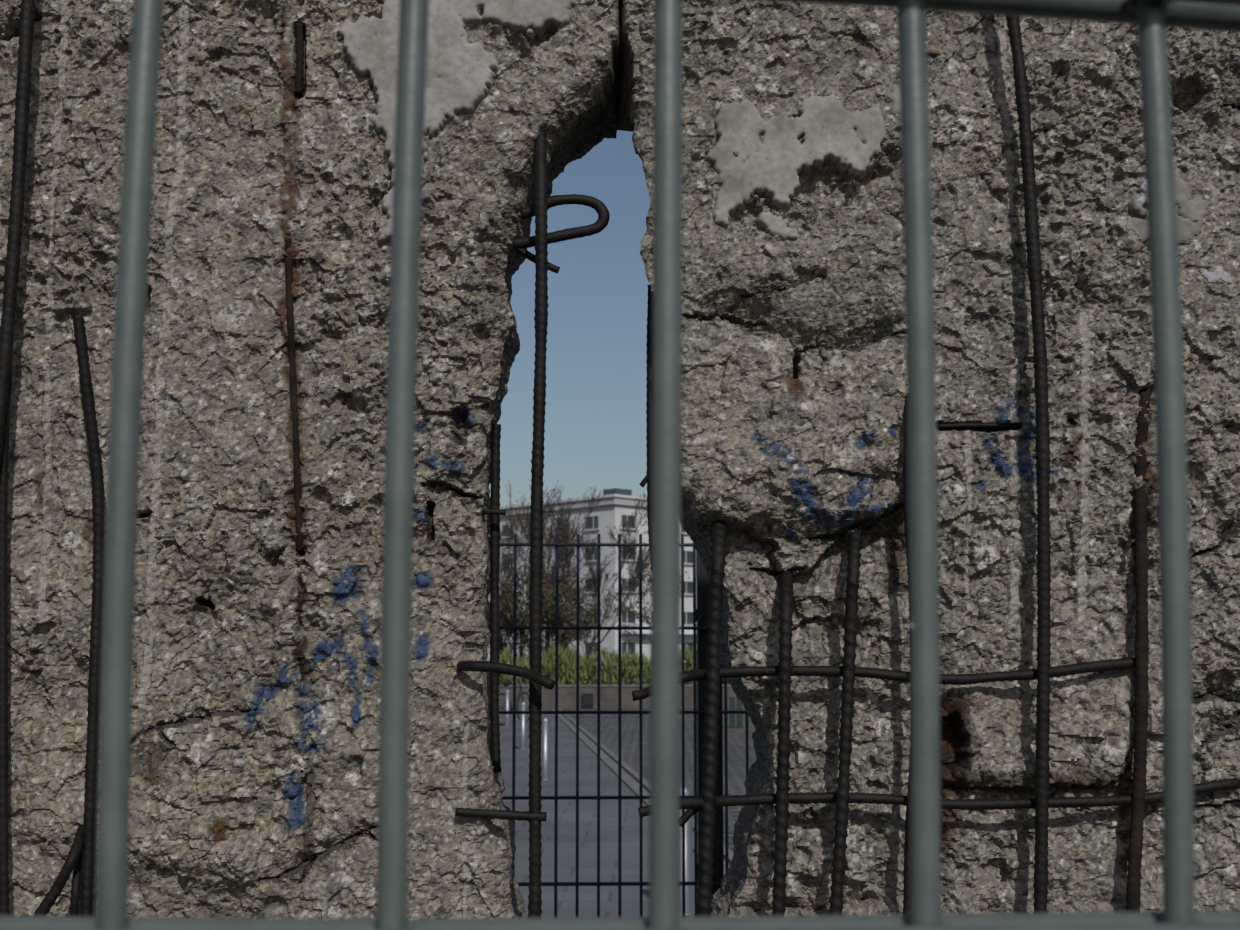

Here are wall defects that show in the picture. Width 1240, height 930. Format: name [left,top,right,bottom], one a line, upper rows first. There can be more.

peeling [422,0,577,180]
peeling [691,85,903,241]
rust [278,4,306,552]
crack [682,312,697,320]
crack [797,331,906,353]
spalling [425,121,610,918]
spalling [938,16,1163,913]
spalling [33,315,105,917]
rust [293,574,310,696]
crack [131,708,254,747]
rust [940,695,972,850]
crack [256,824,378,884]